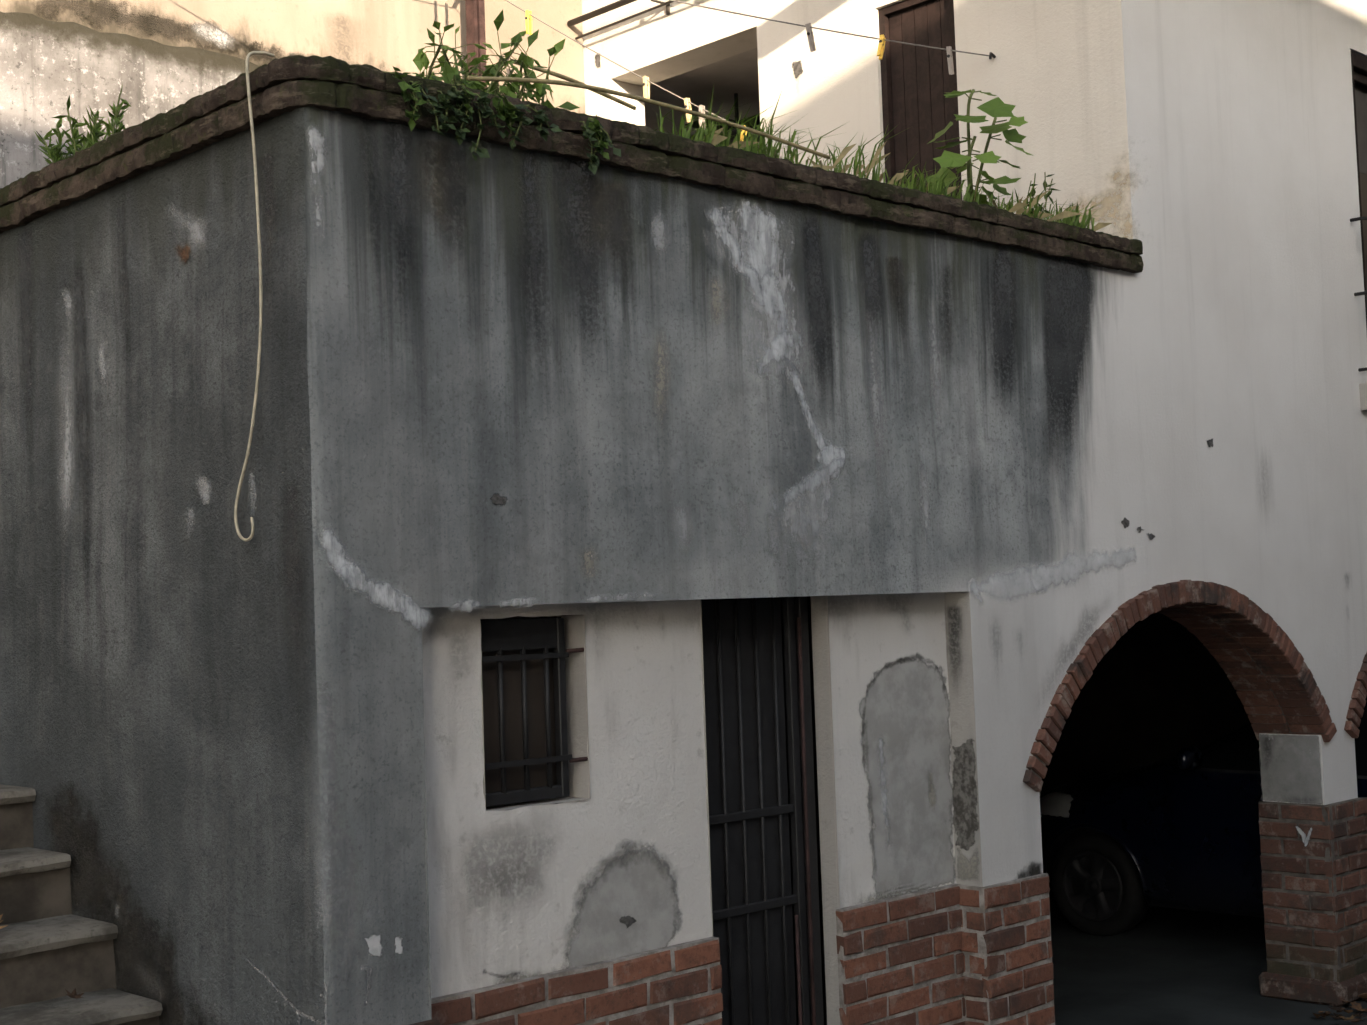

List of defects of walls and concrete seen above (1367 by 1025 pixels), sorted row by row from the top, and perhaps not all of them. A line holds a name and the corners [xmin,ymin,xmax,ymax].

damp [36,0,306,60]
damp [309,128,324,172]
damp [64,268,103,549]
damp [522,150,628,345]
damp [654,218,665,248]
damp [804,219,833,381]
damp [987,248,1016,392]
damp [1045,257,1093,439]
flaking render [948,607,961,668]
flaking render [952,739,979,879]
damp [49,786,206,1025]
peeling [619,916,636,928]